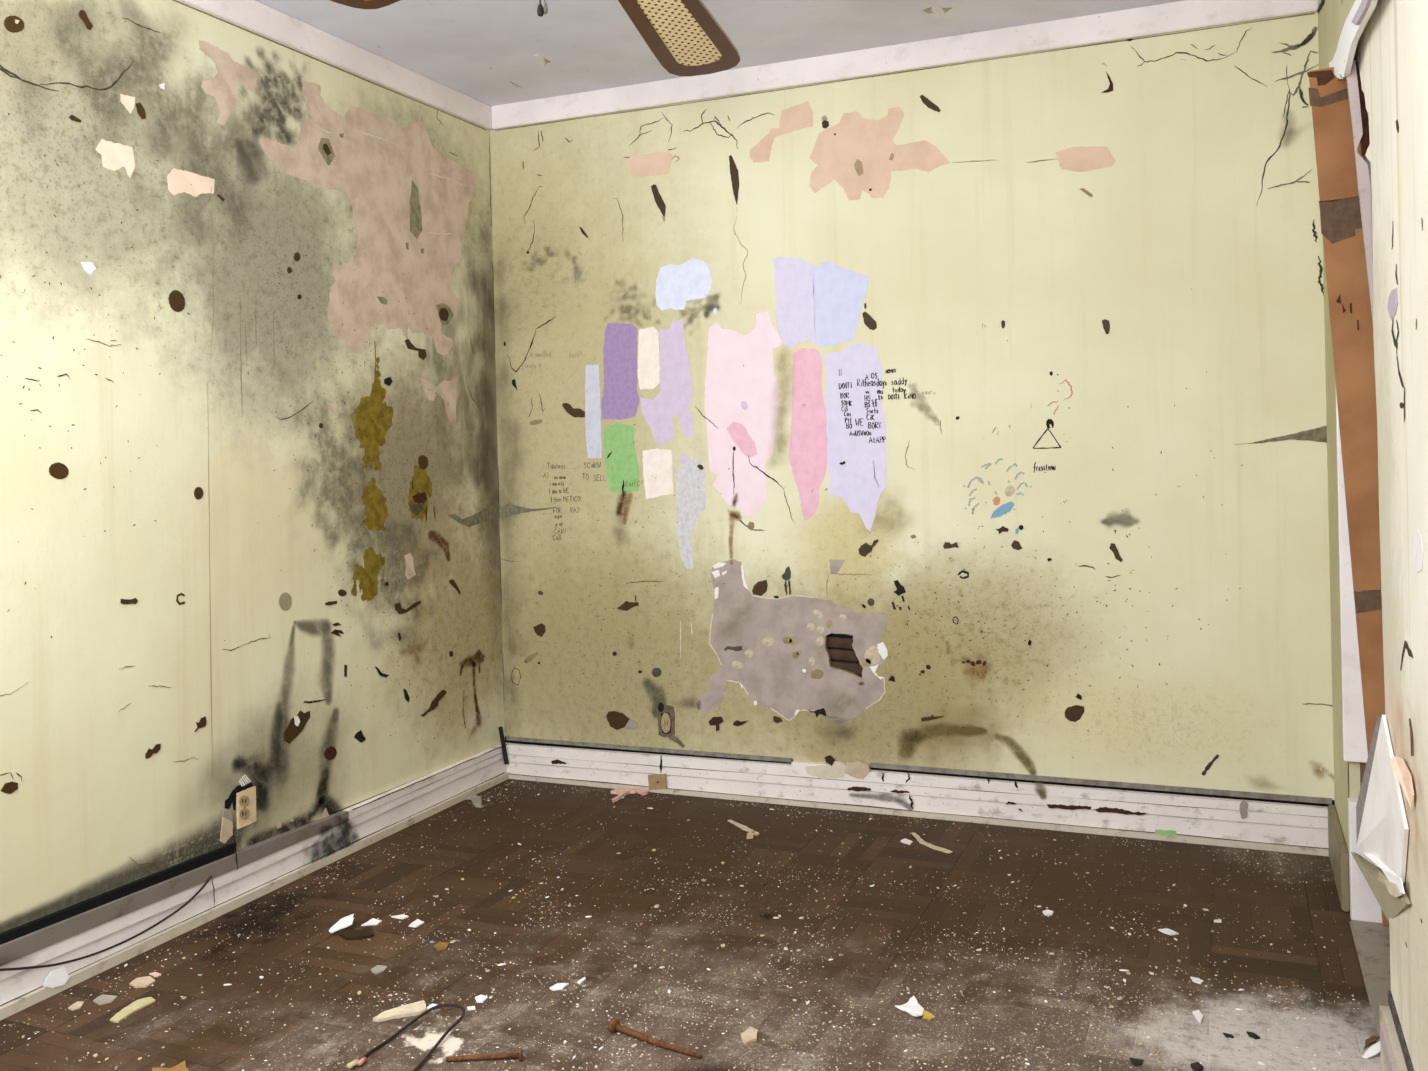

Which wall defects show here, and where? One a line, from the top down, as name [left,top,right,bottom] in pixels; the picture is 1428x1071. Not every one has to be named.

crack [0,60,134,91]
peeling [199,40,257,126]
damp [238,64,302,174]
crack [624,109,774,162]
peeling [750,101,950,201]
peeling [1055,146,1116,172]
crack [1126,29,1291,206]
peeling [259,82,481,356]
peeling [421,374,460,421]
damp [289,328,440,606]
flaking render [696,559,888,724]
damp [900,725,1046,799]